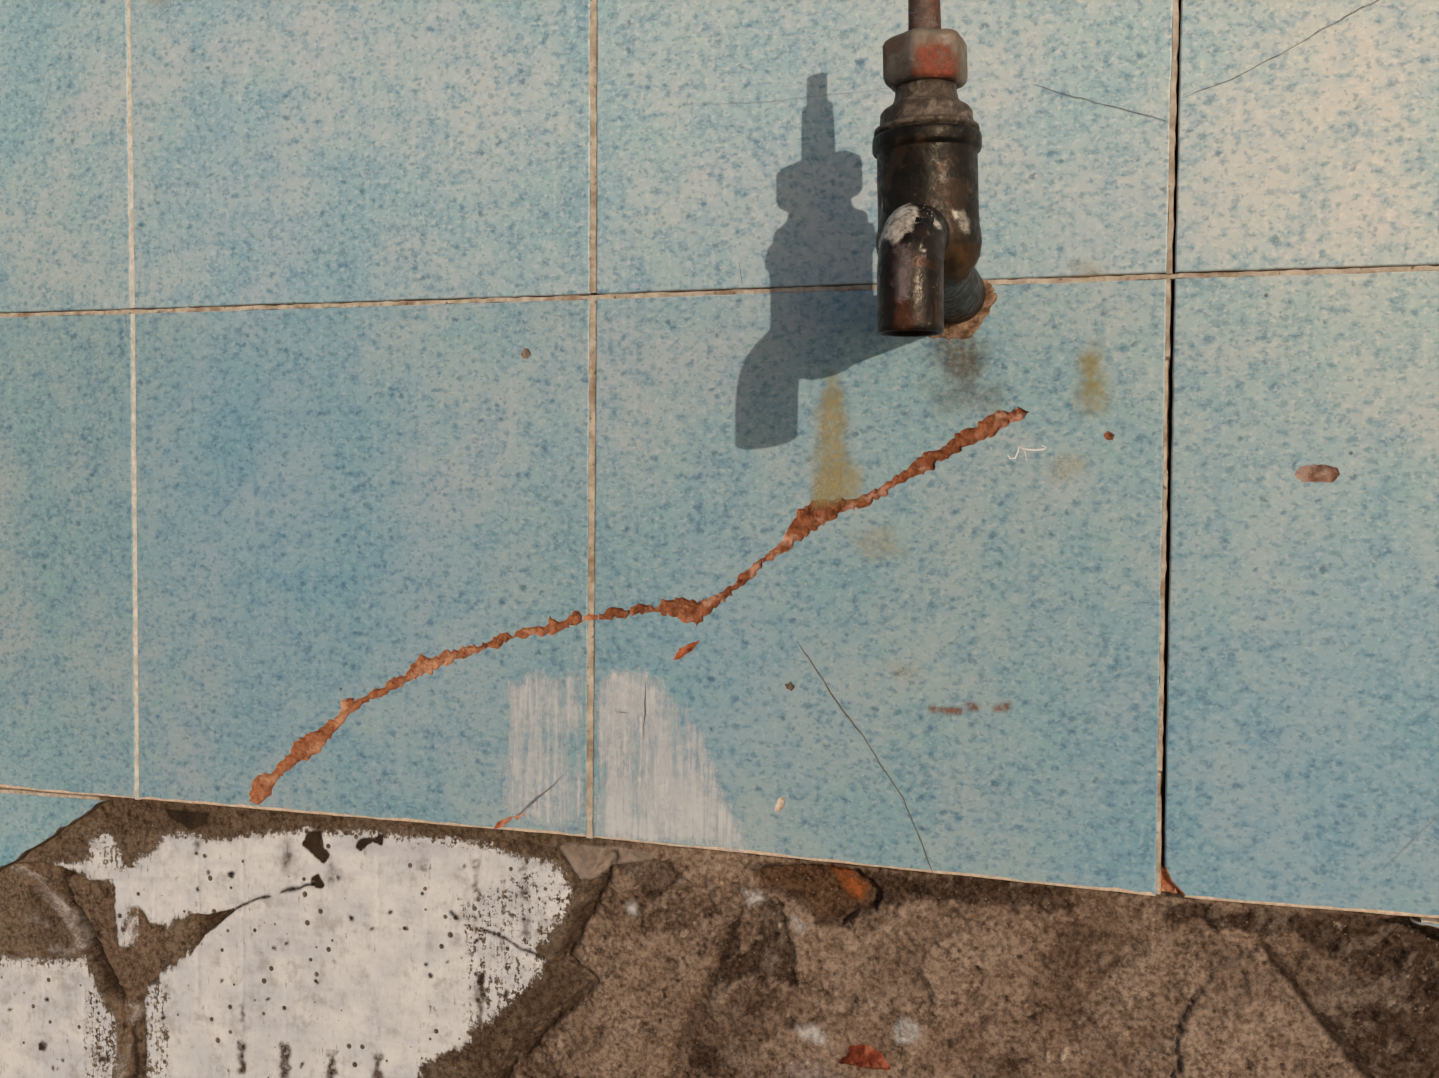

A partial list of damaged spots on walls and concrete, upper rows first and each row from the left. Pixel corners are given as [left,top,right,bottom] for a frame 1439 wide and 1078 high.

corrosion [913,44,955,79]
spalling [1295,464,1340,483]
crack [249,407,1029,805]
crack [494,776,562,829]
damp [600,688,672,814]
crack [796,640,934,876]
spalling [1161,865,1181,893]
peeling [0,954,123,1078]
crack [63,870,148,1078]
peeling [47,809,654,1078]
crack [1261,943,1373,1078]